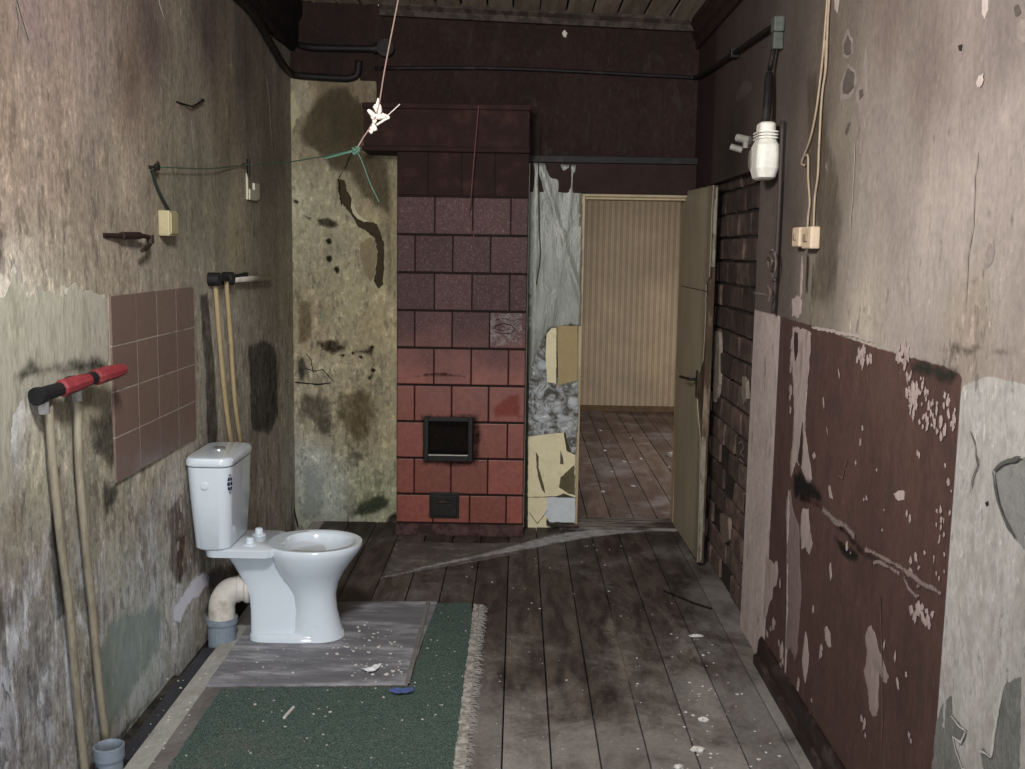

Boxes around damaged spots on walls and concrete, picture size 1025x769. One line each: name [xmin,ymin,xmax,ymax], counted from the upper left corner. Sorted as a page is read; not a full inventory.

crack [338,153,352,206]
damp [304,90,387,207]
damp [72,358,105,371]
peeling [856,343,872,371]
peeling [895,339,956,441]
damp [355,496,388,514]
peeling [764,260,831,691]
flaking render [985,456,1025,549]
spalling [823,485,951,630]
peeling [860,625,907,738]
flaking render [932,696,968,769]
flaking render [980,677,1021,769]